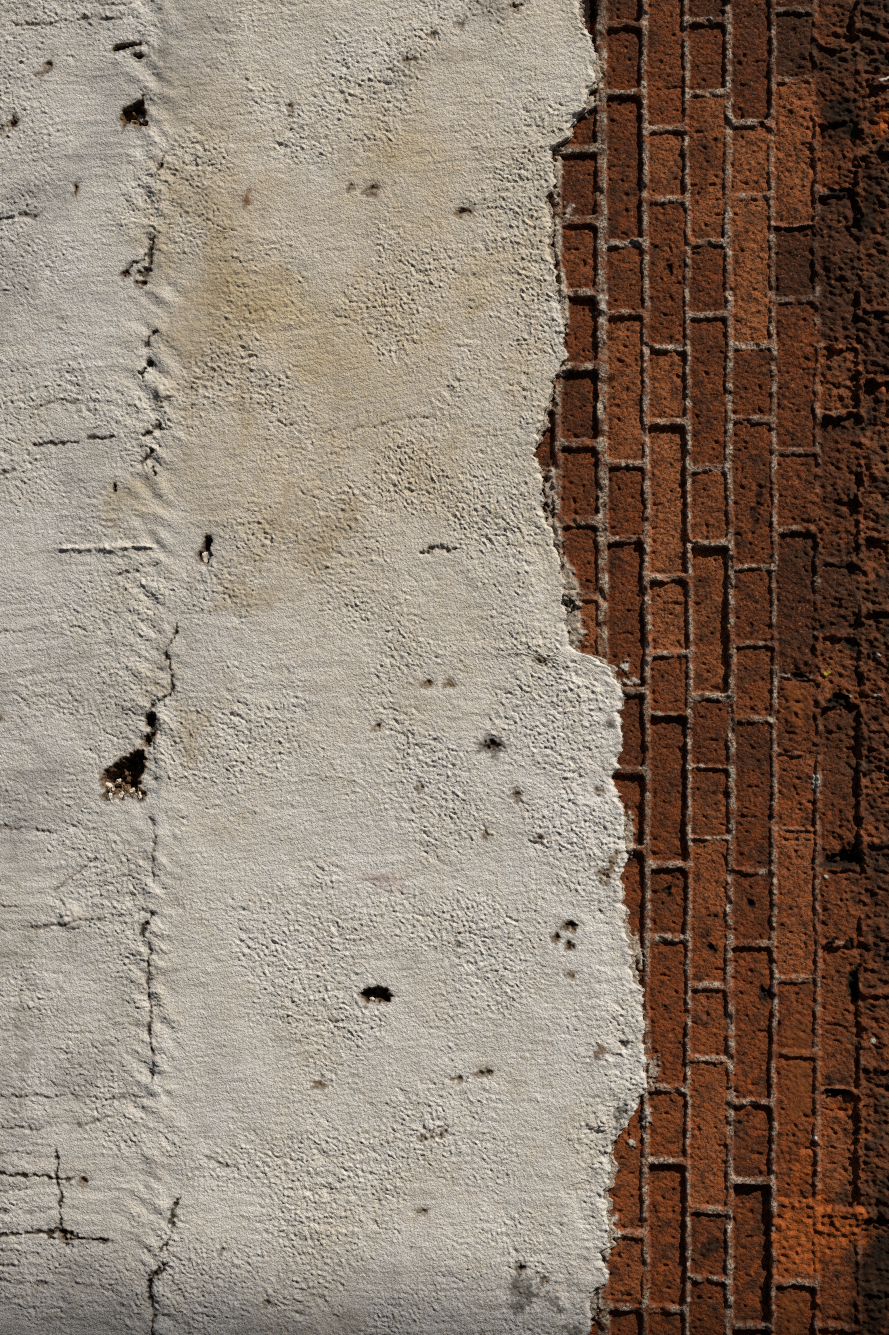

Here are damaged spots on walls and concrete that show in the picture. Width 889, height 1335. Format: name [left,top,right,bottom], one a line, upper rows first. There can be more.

spalling [870,108,889,138]
crack [147,624,178,743]
spalling [534,0,650,1335]
spalling [786,686,805,727]
crack [0,1150,107,1246]
crack [147,1197,181,1335]
spalling [767,1139,871,1276]